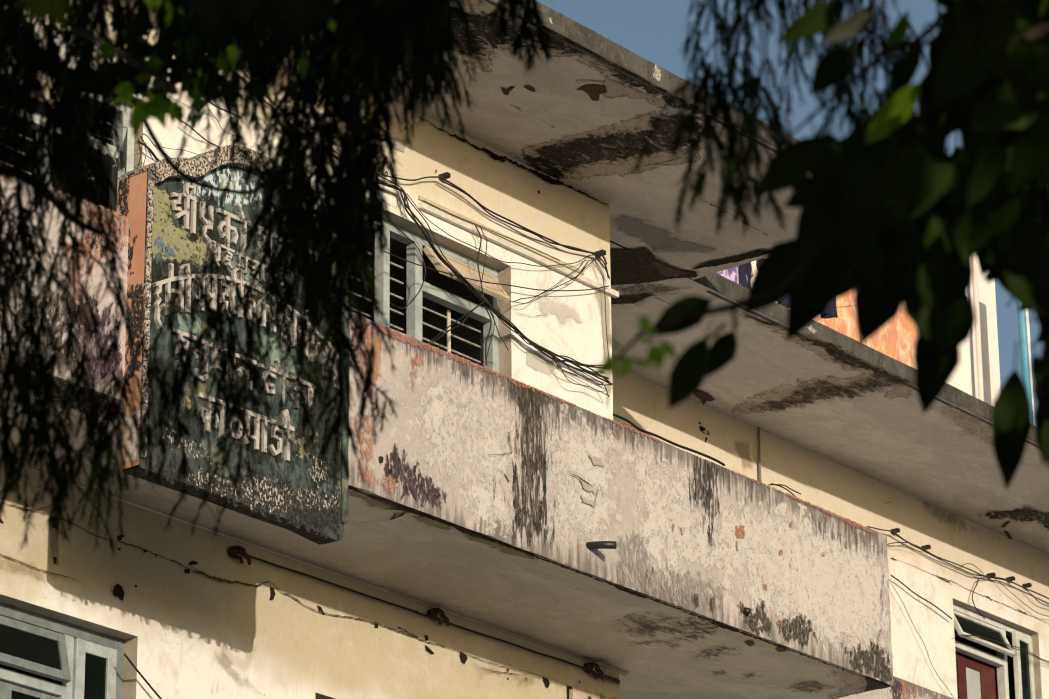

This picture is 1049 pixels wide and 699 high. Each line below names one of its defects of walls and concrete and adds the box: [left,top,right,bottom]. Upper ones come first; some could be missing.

peeling [501,85,535,95]
peeling [576,80,606,101]
damp [117,178,130,217]
spalling [610,243,697,305]
damp [2,193,916,699]
peeling [163,324,893,669]
spalling [979,507,1049,540]
crack [0,503,556,681]